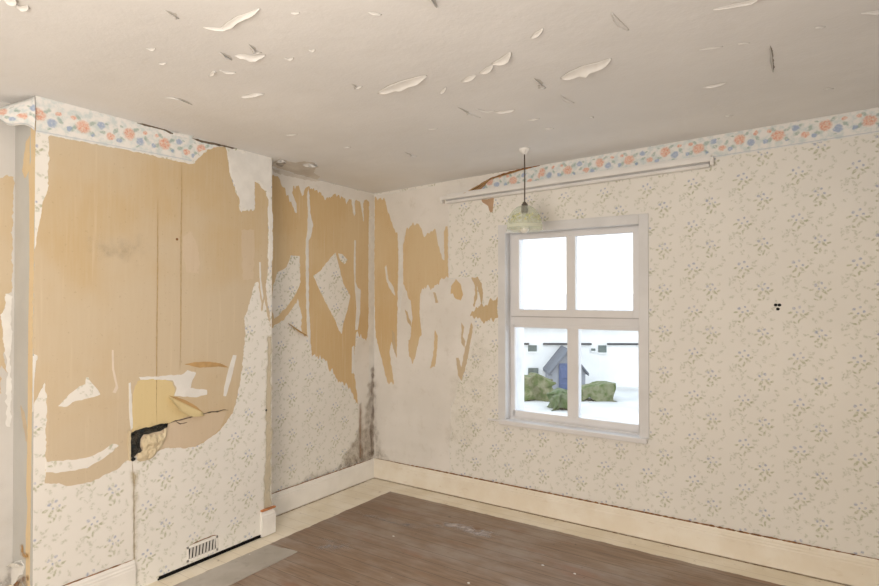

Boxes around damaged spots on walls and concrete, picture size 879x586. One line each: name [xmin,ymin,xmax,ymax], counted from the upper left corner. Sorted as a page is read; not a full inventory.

peeling [4,0,31,12]
peeling [203,8,260,31]
peeling [219,44,265,62]
peeling [461,52,512,82]
peeling [560,58,611,80]
peeling [377,75,427,94]
peeling [0,97,35,131]
flaking render [374,185,498,473]
peeling [128,370,207,461]